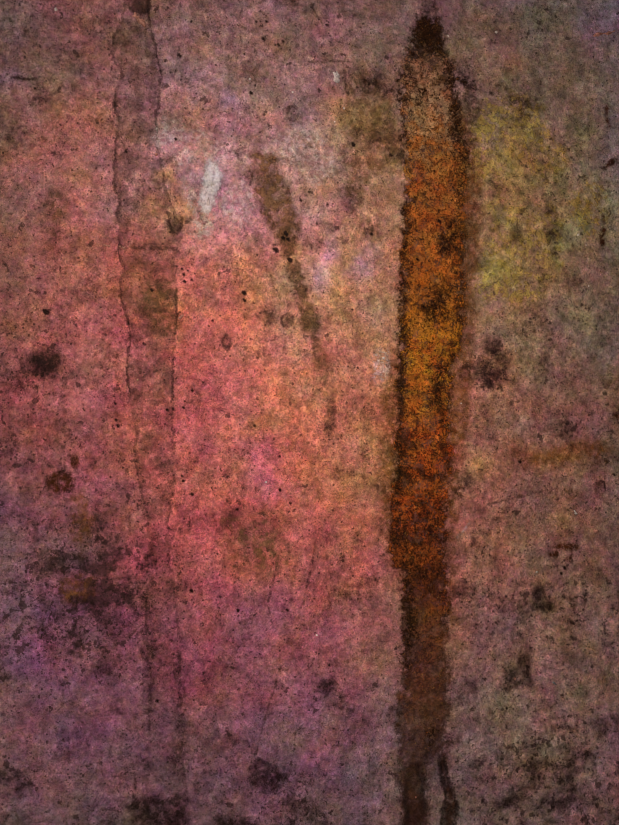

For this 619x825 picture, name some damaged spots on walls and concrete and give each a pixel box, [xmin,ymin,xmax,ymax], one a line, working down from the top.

leakage [128,0,151,22]
leakage [246,152,329,385]
corrosion [380,14,479,825]
leakage [134,796,188,825]